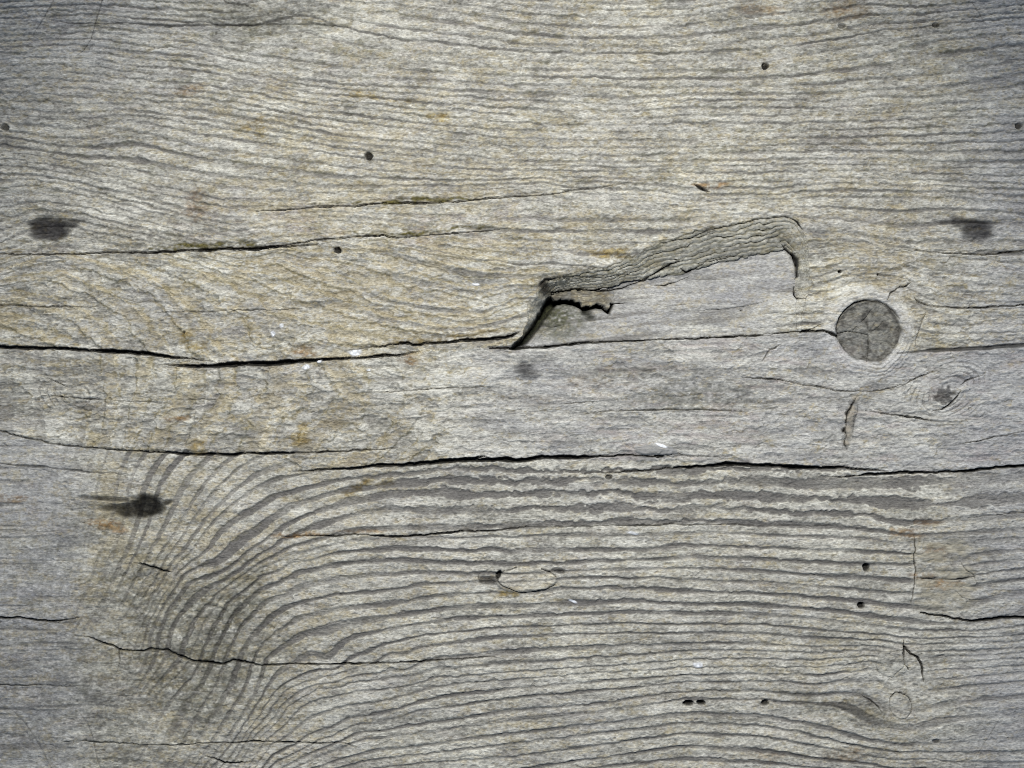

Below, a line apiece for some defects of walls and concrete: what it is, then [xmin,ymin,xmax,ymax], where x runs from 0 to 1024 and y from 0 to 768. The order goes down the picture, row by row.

crack [0,284,925,368]
spalling [513,300,610,349]
crack [59,386,1024,477]
crack [95,639,474,665]